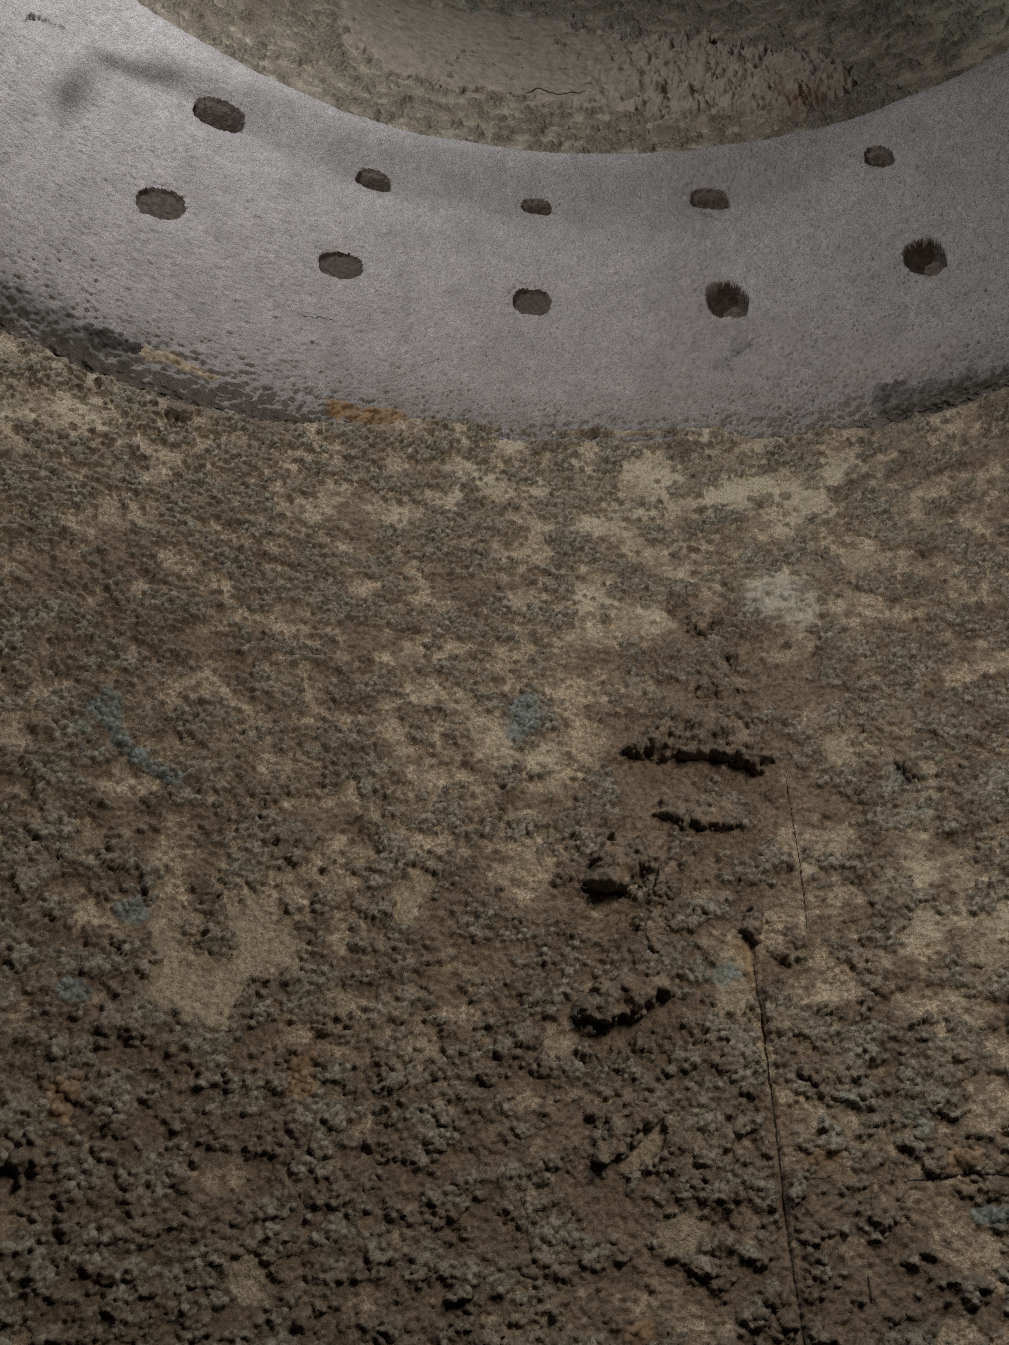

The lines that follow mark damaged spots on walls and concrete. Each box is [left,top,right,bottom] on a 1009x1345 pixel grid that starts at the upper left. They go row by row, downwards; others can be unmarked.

crack [601,948,1009,1345]